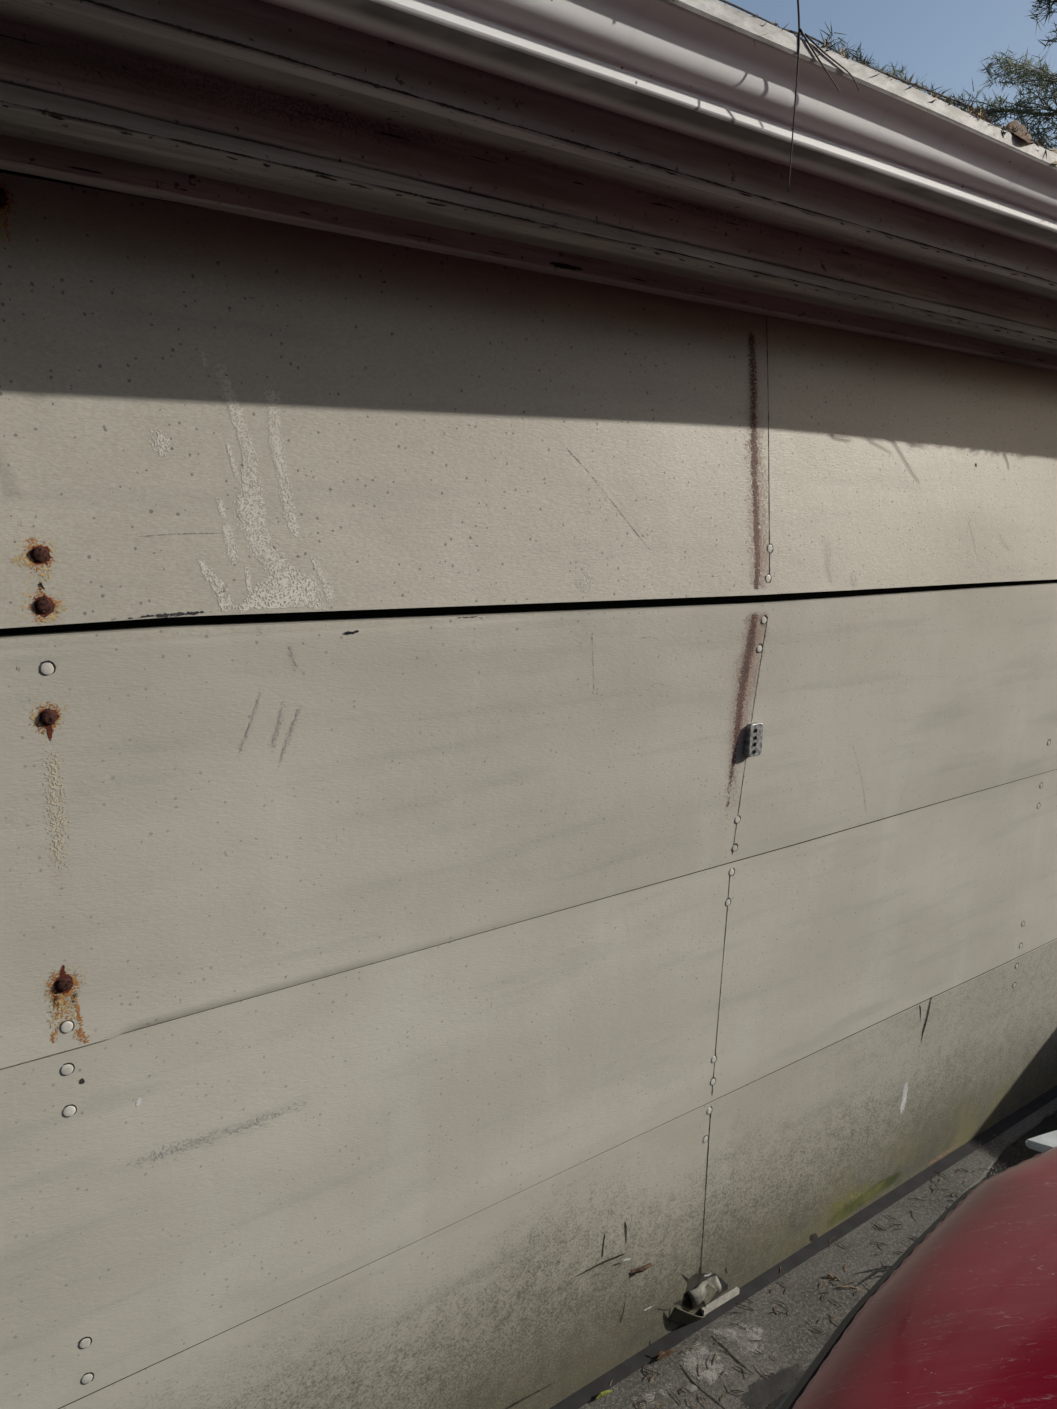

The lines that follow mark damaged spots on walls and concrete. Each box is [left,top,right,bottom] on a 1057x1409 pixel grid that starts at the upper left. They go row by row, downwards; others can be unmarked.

rust [743,332,772,589]
rust [9,530,71,626]
rust [27,696,72,903]
rust [725,609,769,825]
rust [35,963,92,1044]
leakage [739,1364,803,1409]